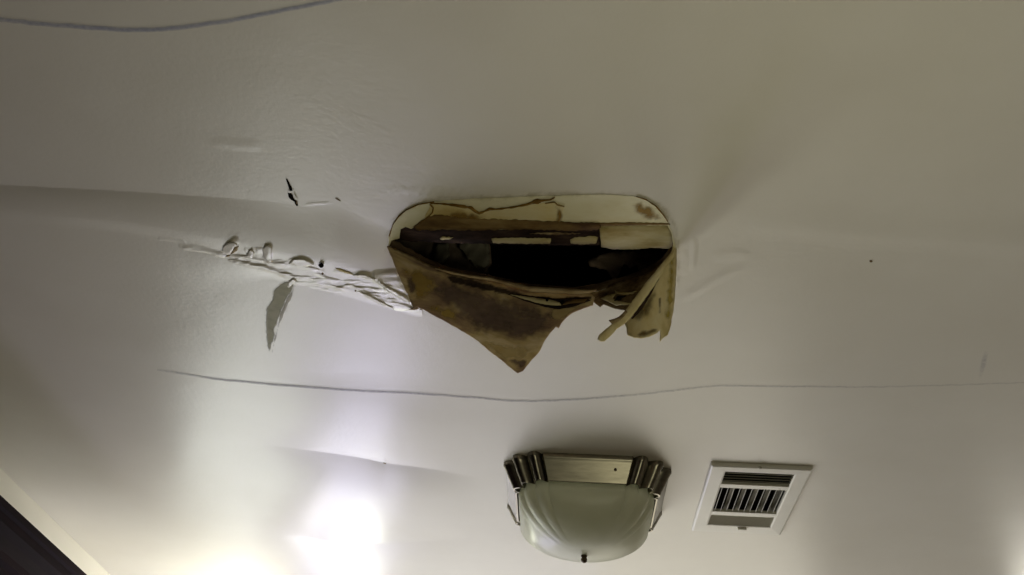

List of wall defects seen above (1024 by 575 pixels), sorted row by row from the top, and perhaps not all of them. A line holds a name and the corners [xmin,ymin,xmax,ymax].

crack [286,179,340,206]
peeling [222,242,272,262]
peeling [388,194,676,291]
water stain [636,259,673,318]
water stain [405,271,591,367]